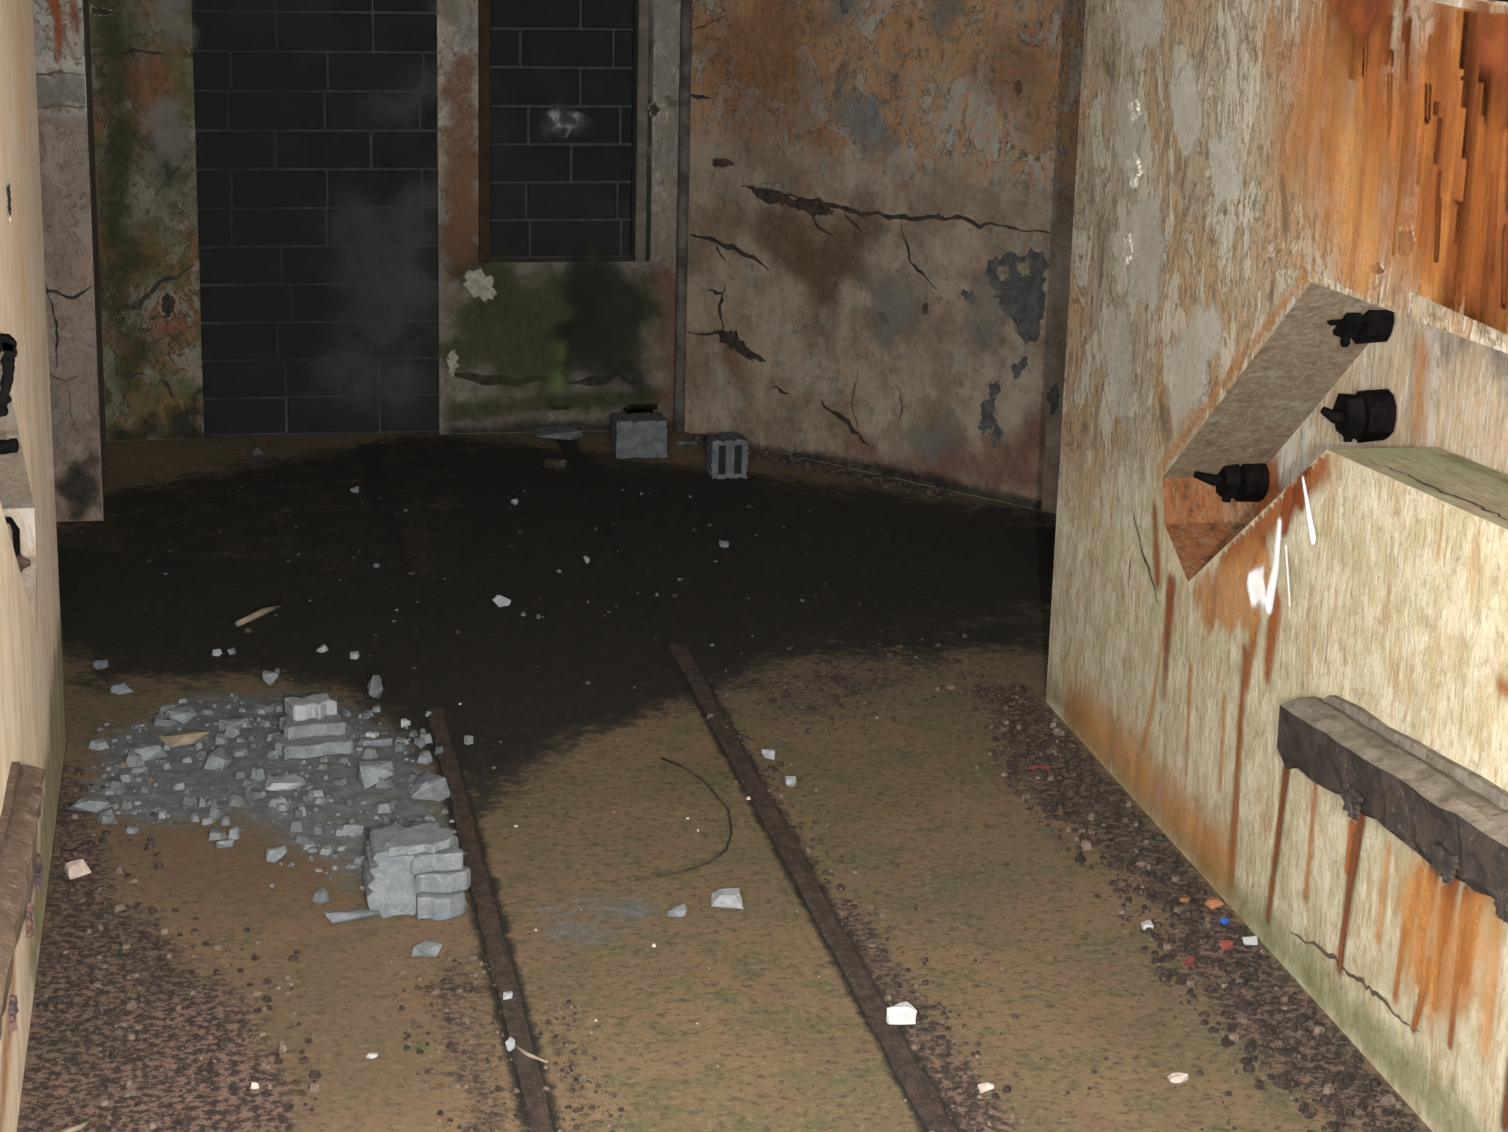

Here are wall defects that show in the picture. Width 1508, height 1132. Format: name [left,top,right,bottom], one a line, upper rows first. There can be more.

leakage [555,257,643,389]
crack [688,234,869,445]
crack [741,185,1051,290]
crack [895,384,903,422]
peeling [961,247,1050,448]
peeling [1046,382,1061,415]
corrosion [1328,0,1508,308]
corrosion [1143,505,1175,749]
corrosion [1195,456,1328,897]
corrosion [1266,765,1289,922]
corrosion [1337,811,1365,973]
corrosion [1393,864,1500,1052]